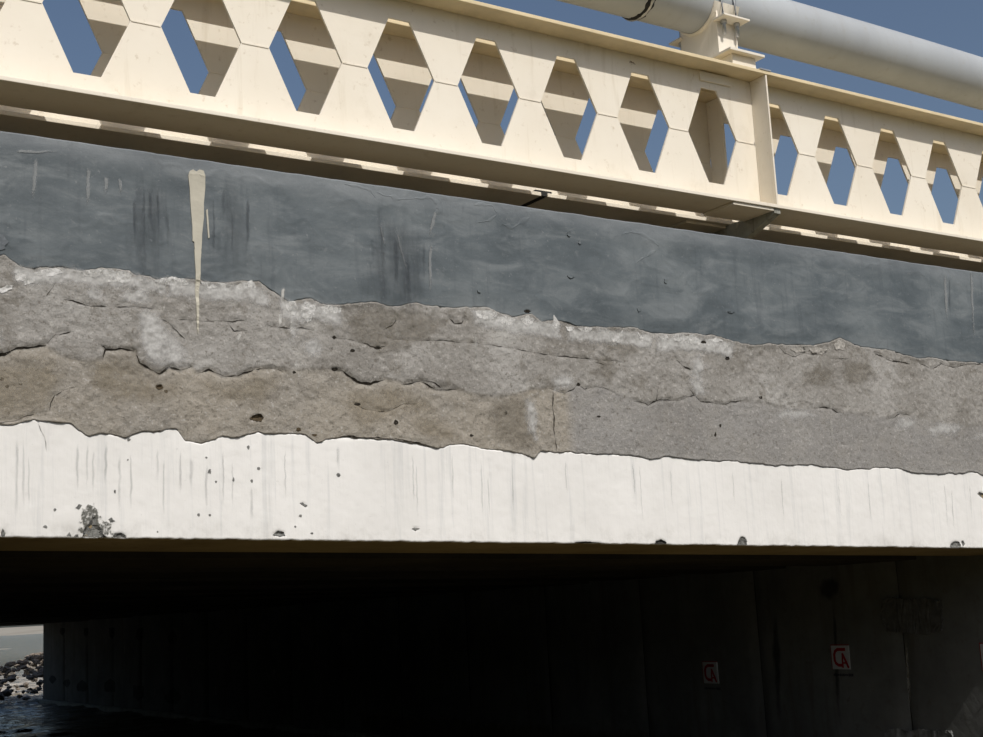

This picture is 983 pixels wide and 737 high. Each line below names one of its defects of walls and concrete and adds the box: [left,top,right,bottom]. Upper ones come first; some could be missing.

peeling [0,268,62,293]
peeling [82,269,132,283]
peeling [154,276,188,286]
peeling [286,301,342,322]
peeling [476,310,535,326]
peeling [552,315,593,333]
crack [0,332,69,356]
peeling [659,334,723,345]
crack [101,345,281,377]
crack [340,315,622,448]
crack [637,361,738,405]
spalling [67,504,126,538]